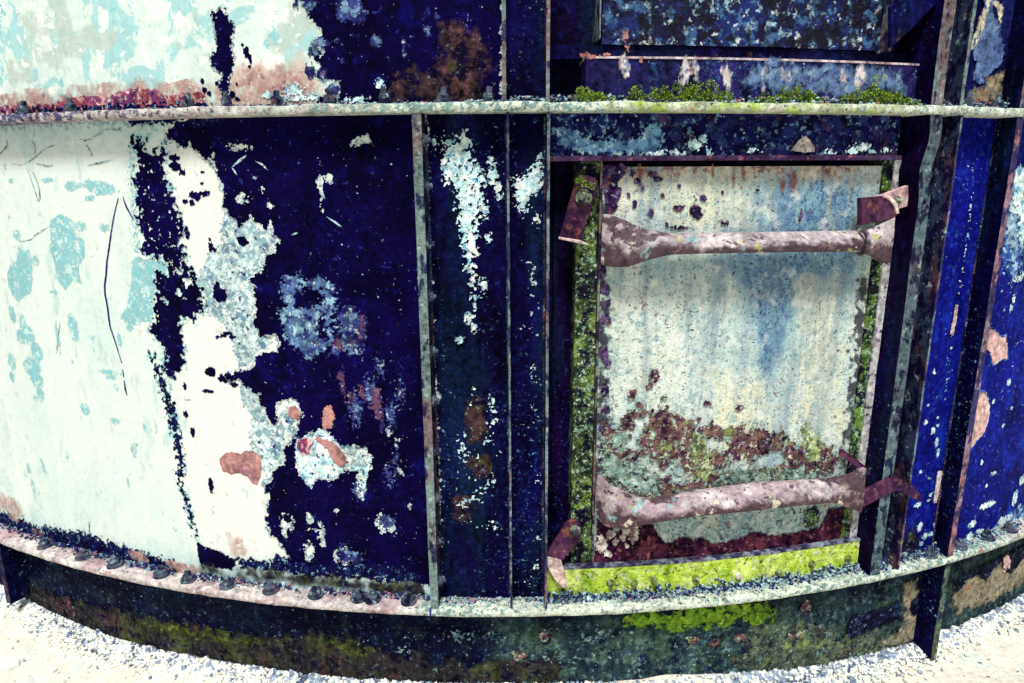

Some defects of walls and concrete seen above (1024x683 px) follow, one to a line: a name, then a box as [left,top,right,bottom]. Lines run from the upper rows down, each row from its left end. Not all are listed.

rust [0,65,315,115]
rust [387,20,492,103]
peeling [1010,163,1024,246]
peeling [7,230,44,402]
peeling [41,0,508,588]
peeling [986,327,1009,366]
rust [596,369,842,498]
peeling [971,389,995,448]
rust [219,451,262,485]
leakage [442,629,507,676]
leakage [581,628,636,644]
leakage [695,626,784,668]